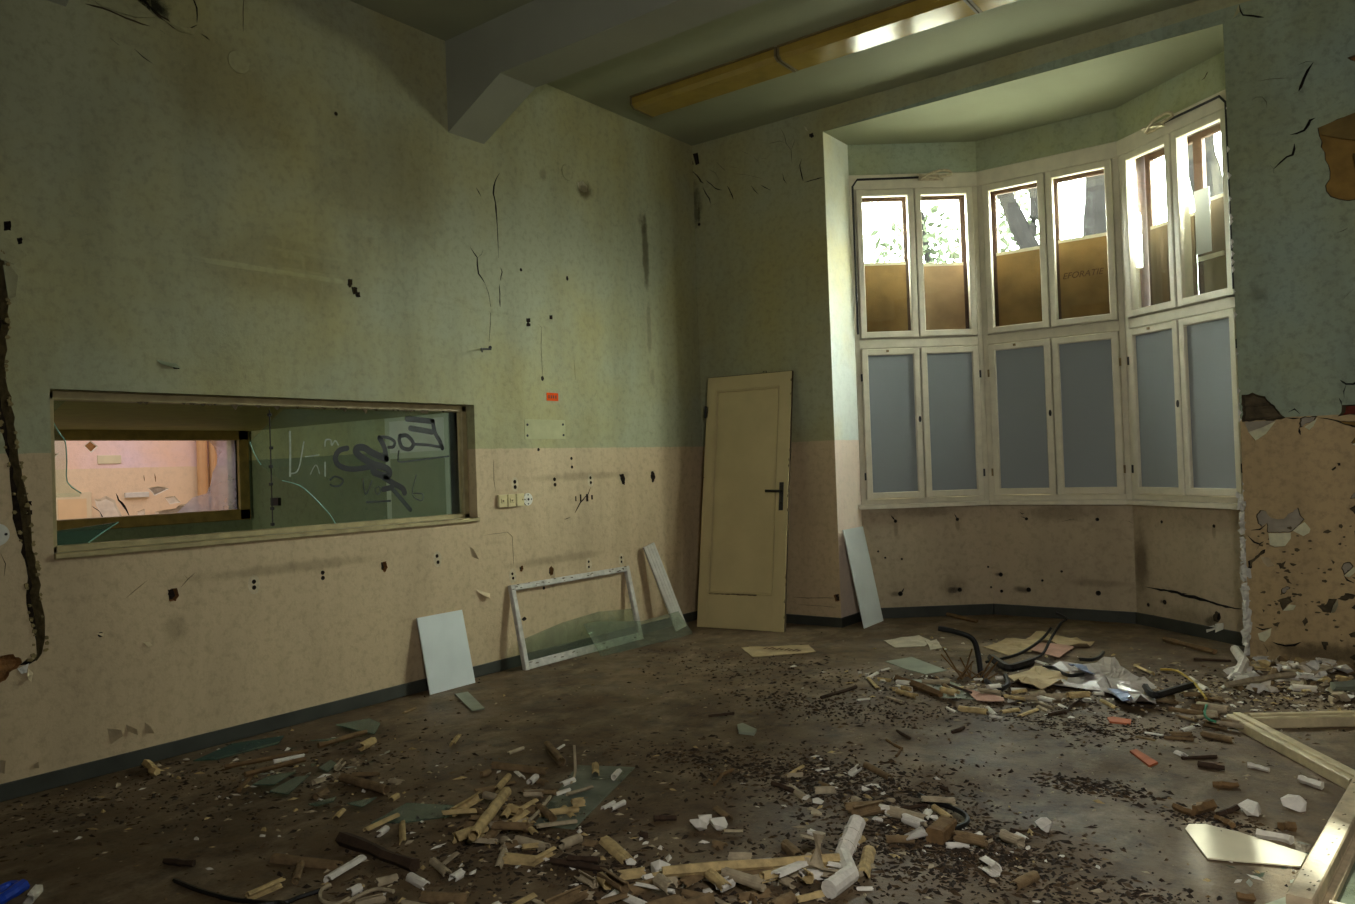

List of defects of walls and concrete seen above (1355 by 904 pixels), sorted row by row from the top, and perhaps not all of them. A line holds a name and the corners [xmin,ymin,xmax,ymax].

peeling [1318,113,1355,201]
crack [0,237,49,665]
flaking render [1237,388,1317,440]
flaking render [1338,404,1355,446]
flaking render [1235,482,1355,660]
crack [1148,587,1240,609]
flaking render [1206,611,1224,632]
flaking render [0,654,33,683]